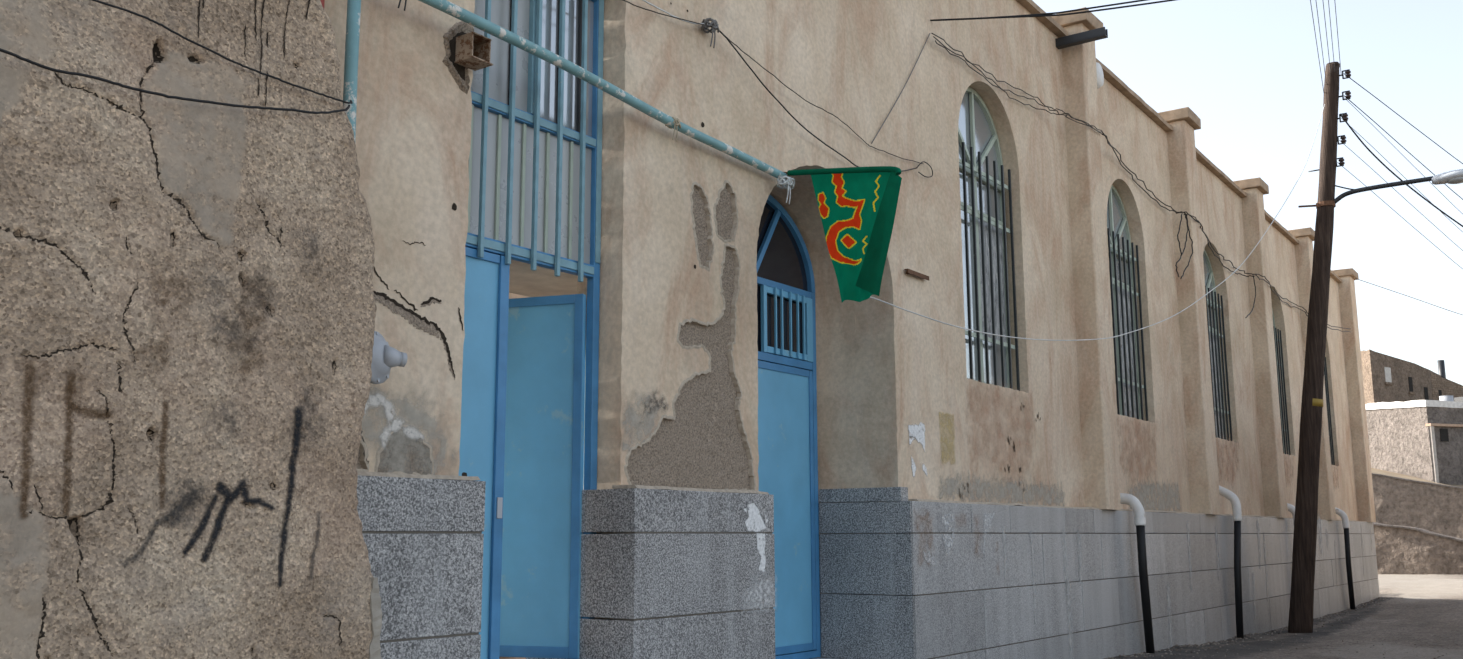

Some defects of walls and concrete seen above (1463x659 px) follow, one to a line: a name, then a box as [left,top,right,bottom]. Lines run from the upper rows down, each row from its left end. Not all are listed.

crack [0,226,139,659]
crack [374,267,463,380]
flaking render [624,180,756,491]